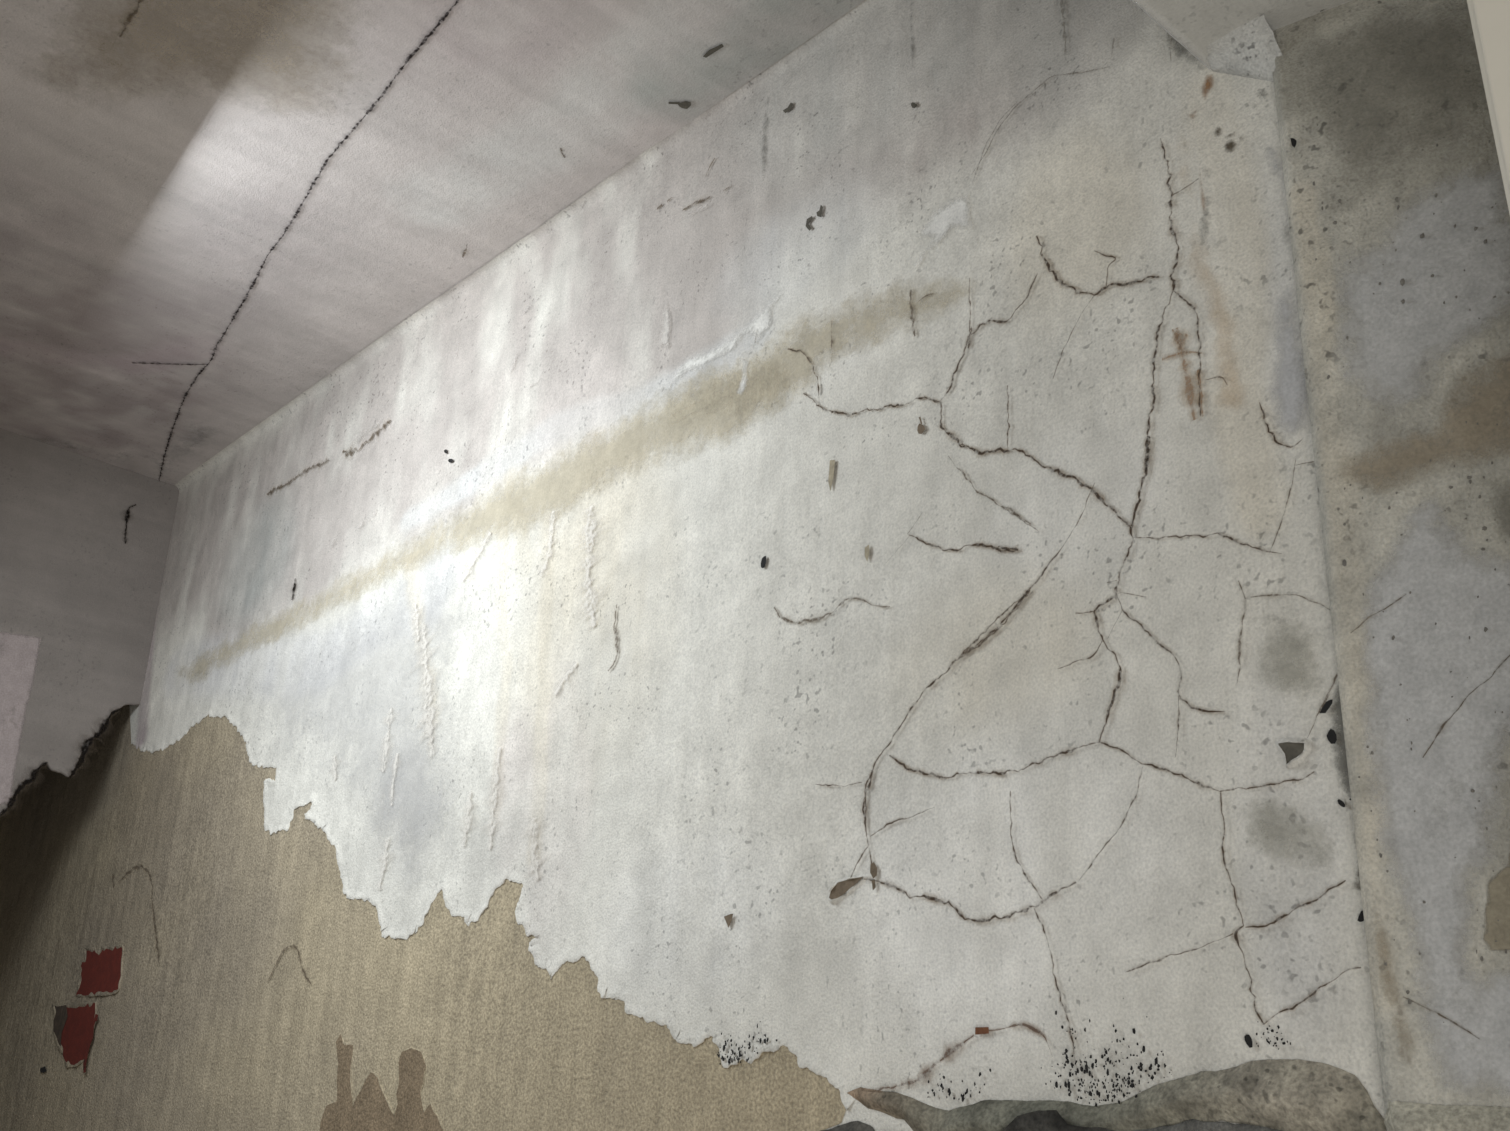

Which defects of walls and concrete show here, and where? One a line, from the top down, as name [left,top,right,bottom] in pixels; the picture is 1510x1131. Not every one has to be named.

crack [119,0,142,37]
crack [124,1,458,544]
water stain [192,290,931,676]
crack [774,138,1402,1092]
rust [1162,328,1203,420]
crack [1423,655,1510,757]
peeling [0,705,877,1131]
peeling [1484,857,1510,950]